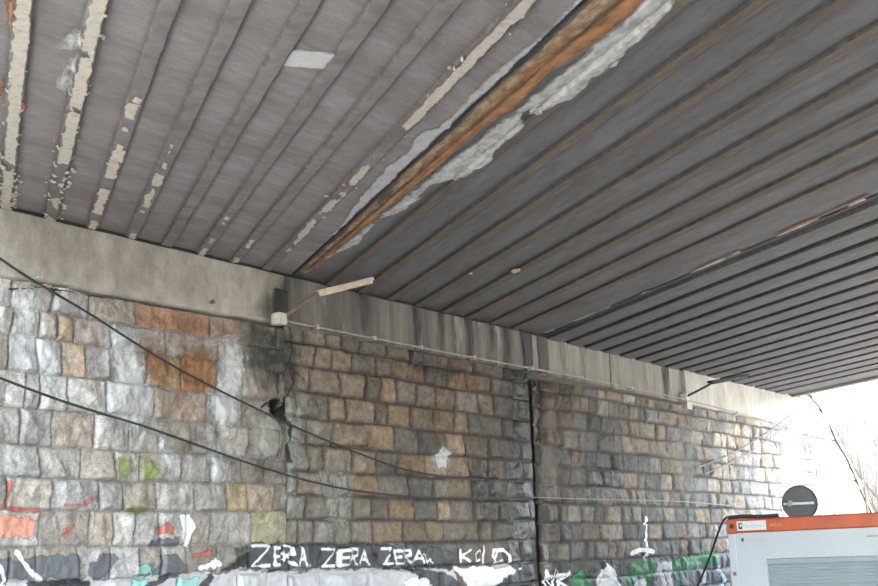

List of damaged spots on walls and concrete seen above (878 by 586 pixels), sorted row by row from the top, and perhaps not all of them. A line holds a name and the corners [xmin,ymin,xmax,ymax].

peeling [0,0,36,211]
peeling [43,0,108,222]
peeling [88,188,111,230]
peeling [105,144,126,179]
peeling [122,97,142,132]
peeling [139,144,174,213]
peeling [286,153,388,252]
peeling [402,0,539,137]
corrosion [300,0,645,274]
water stain [325,0,674,258]
corrosion [181,347,211,386]